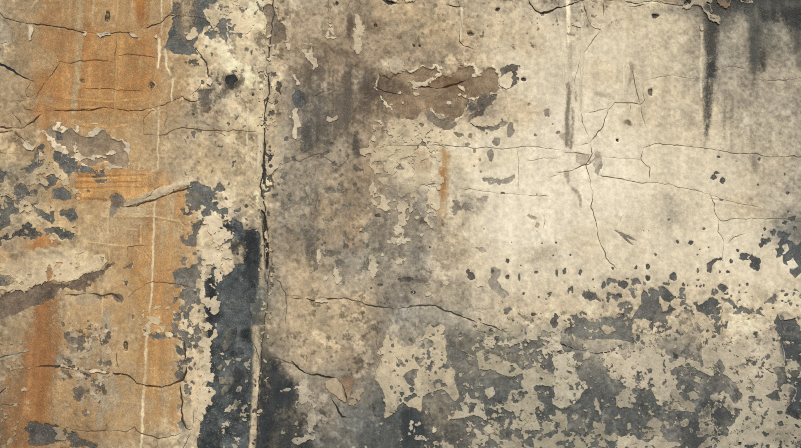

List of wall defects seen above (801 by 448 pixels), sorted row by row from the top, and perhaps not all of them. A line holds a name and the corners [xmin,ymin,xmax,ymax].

crack [529,0,690,81]
water stain [698,0,801,128]
peeling [0,387,98,448]
peeling [0,122,137,320]
peeling [53,316,115,417]
rust [0,0,194,448]
water stain [204,278,217,357]
water stain [223,194,266,284]
crack [0,0,500,448]
peeling [108,0,522,448]
peeling [375,211,801,448]
crack [388,67,801,269]